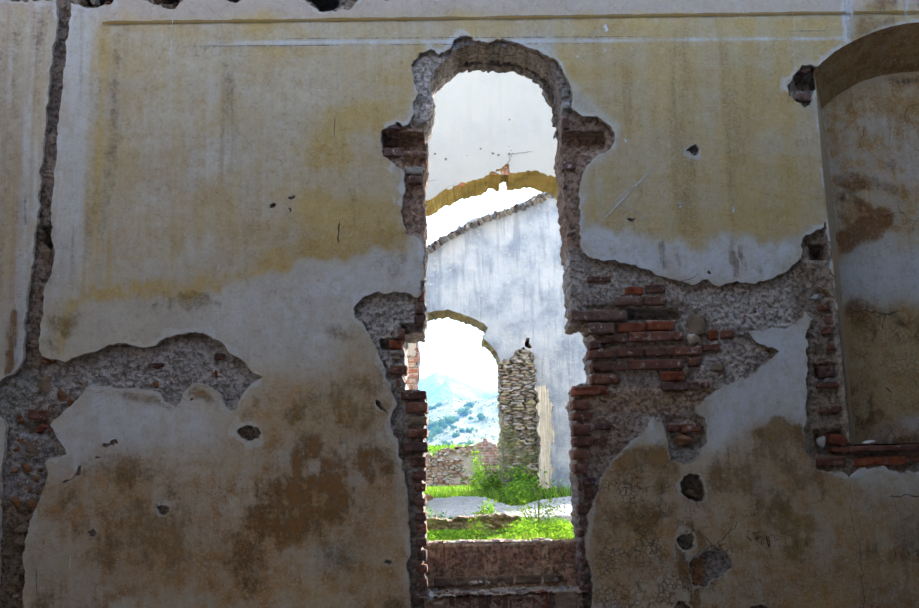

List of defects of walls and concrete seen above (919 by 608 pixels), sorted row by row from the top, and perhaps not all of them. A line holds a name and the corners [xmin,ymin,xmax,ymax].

spalling [66,0,113,11]
spalling [147,0,183,9]
spalling [305,0,358,12]
crack [0,0,263,608]
crack [353,15,919,608]
spalling [354,38,919,608]
spalling [238,425,261,441]
damp [228,434,394,593]
damp [708,417,820,562]